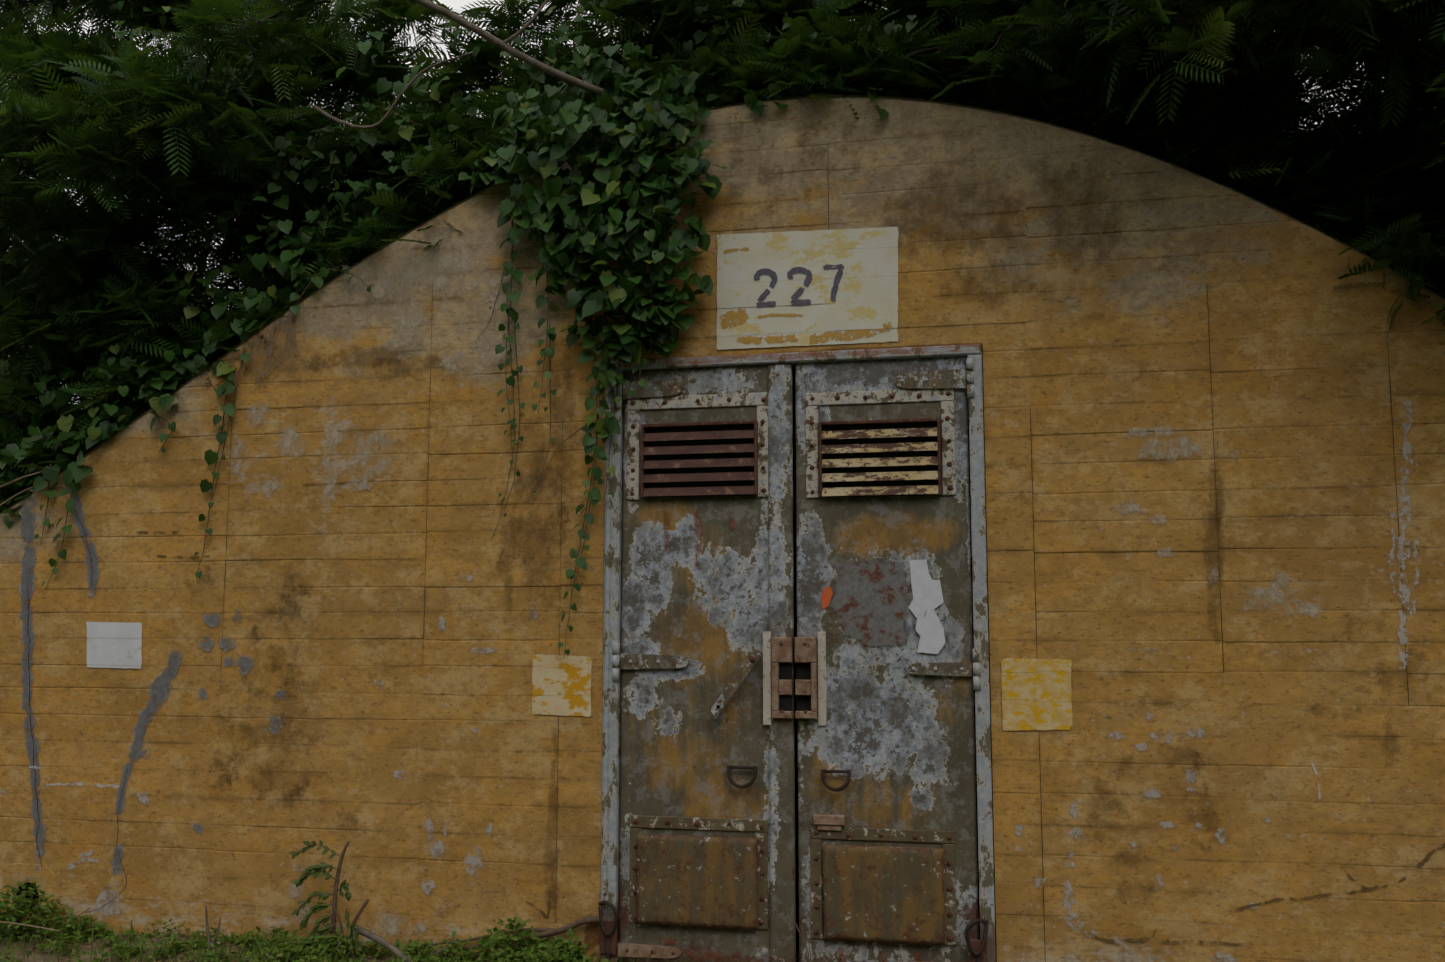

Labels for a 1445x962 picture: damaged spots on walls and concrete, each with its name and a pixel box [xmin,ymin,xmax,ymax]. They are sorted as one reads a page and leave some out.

peeling [322,398,391,512]
crack [67,480,99,598]
crack [18,489,46,871]
spalling [198,610,254,676]
crack [89,650,182,912]
crack [1095,843,1445,946]